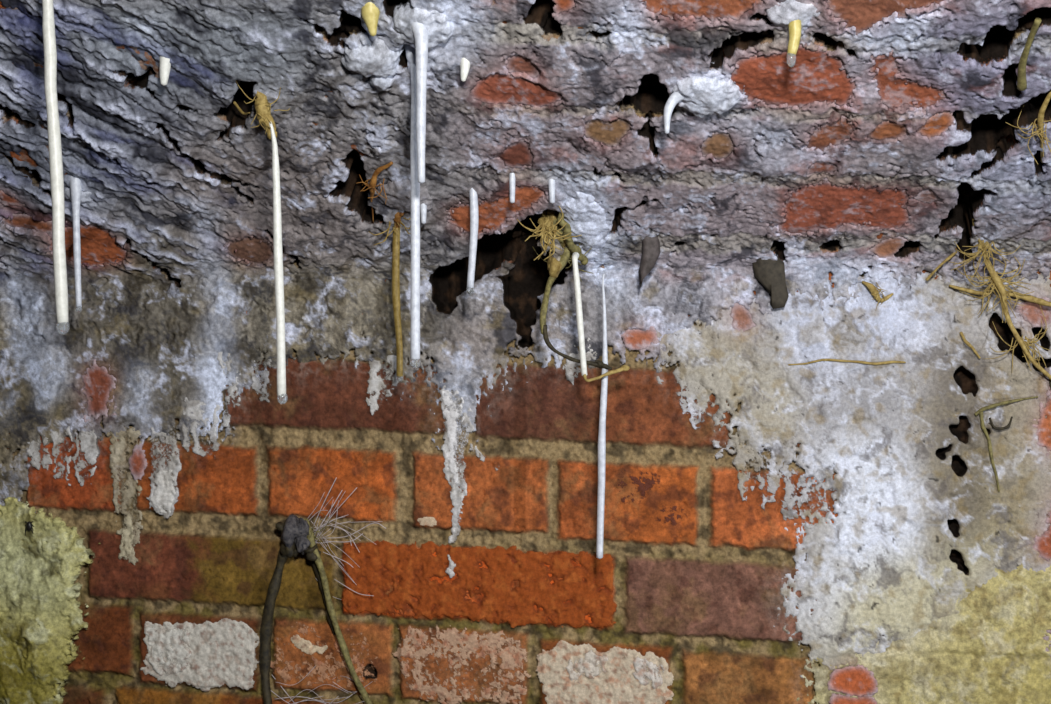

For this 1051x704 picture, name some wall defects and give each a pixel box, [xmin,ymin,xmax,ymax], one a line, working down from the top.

crack [0,104,35,128]
crack [57,93,74,125]
crack [115,67,253,204]
spalling [523,0,575,35]
spalling [584,73,676,157]
flaking render [640,0,955,261]
crack [934,91,1051,261]
hole [957,7,1051,97]
damp [0,0,1051,543]
damp [106,427,143,565]
efflorescence [635,271,1051,671]
damp [445,555,456,578]